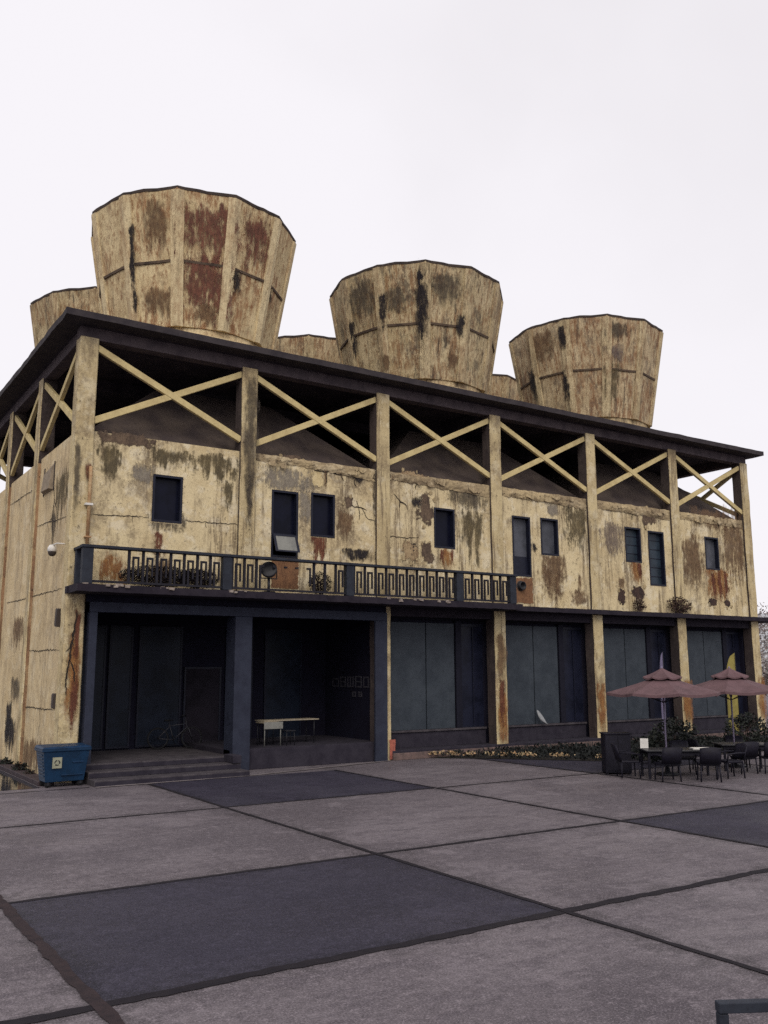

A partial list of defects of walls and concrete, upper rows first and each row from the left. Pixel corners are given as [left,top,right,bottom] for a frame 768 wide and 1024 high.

leakage [128,223,138,312]
rust [142,199,273,328]
leakage [349,268,462,358]
leakage [96,378,260,526]
rust [311,537,327,561]
crack [314,470,440,554]
peeling [392,468,436,529]
leakage [448,491,486,566]
rust [706,567,732,600]
leakage [4,677,20,752]
rust [64,609,81,729]
rust [496,634,508,743]